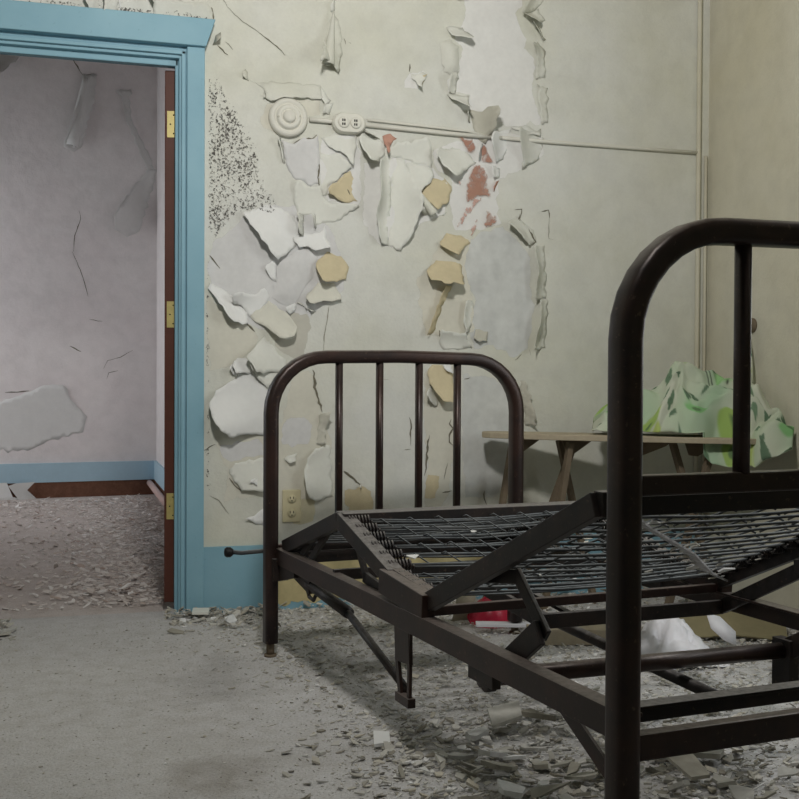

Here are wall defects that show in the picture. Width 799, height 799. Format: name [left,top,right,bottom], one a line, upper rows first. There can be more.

peeling [85,0,121,10]
peeling [153,0,214,19]
crack [223,0,285,55]
leakage [208,80,275,235]
corrosion [459,137,492,224]
peeling [205,0,549,525]